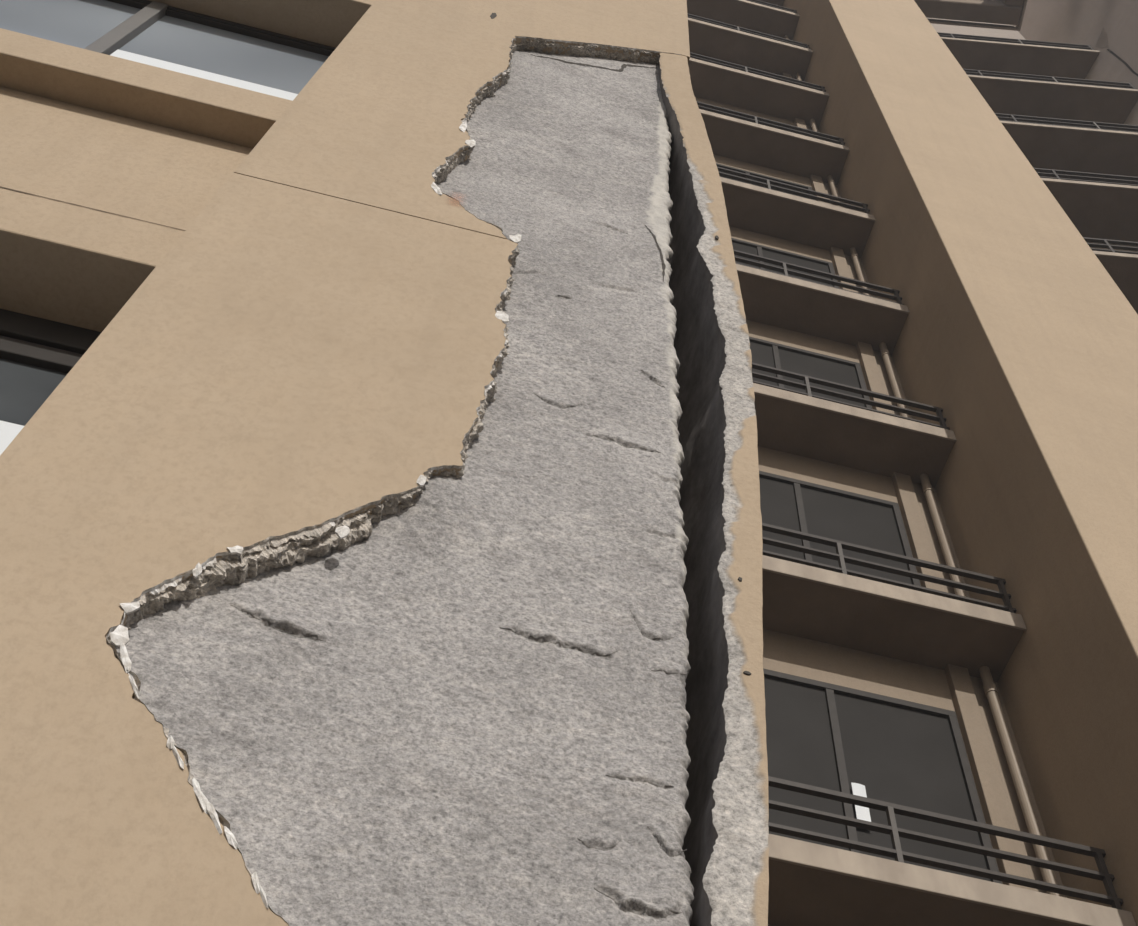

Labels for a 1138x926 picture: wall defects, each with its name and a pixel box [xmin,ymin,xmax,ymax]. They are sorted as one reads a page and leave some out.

flaking render [106,36,694,926]
crack [530,54,729,926]